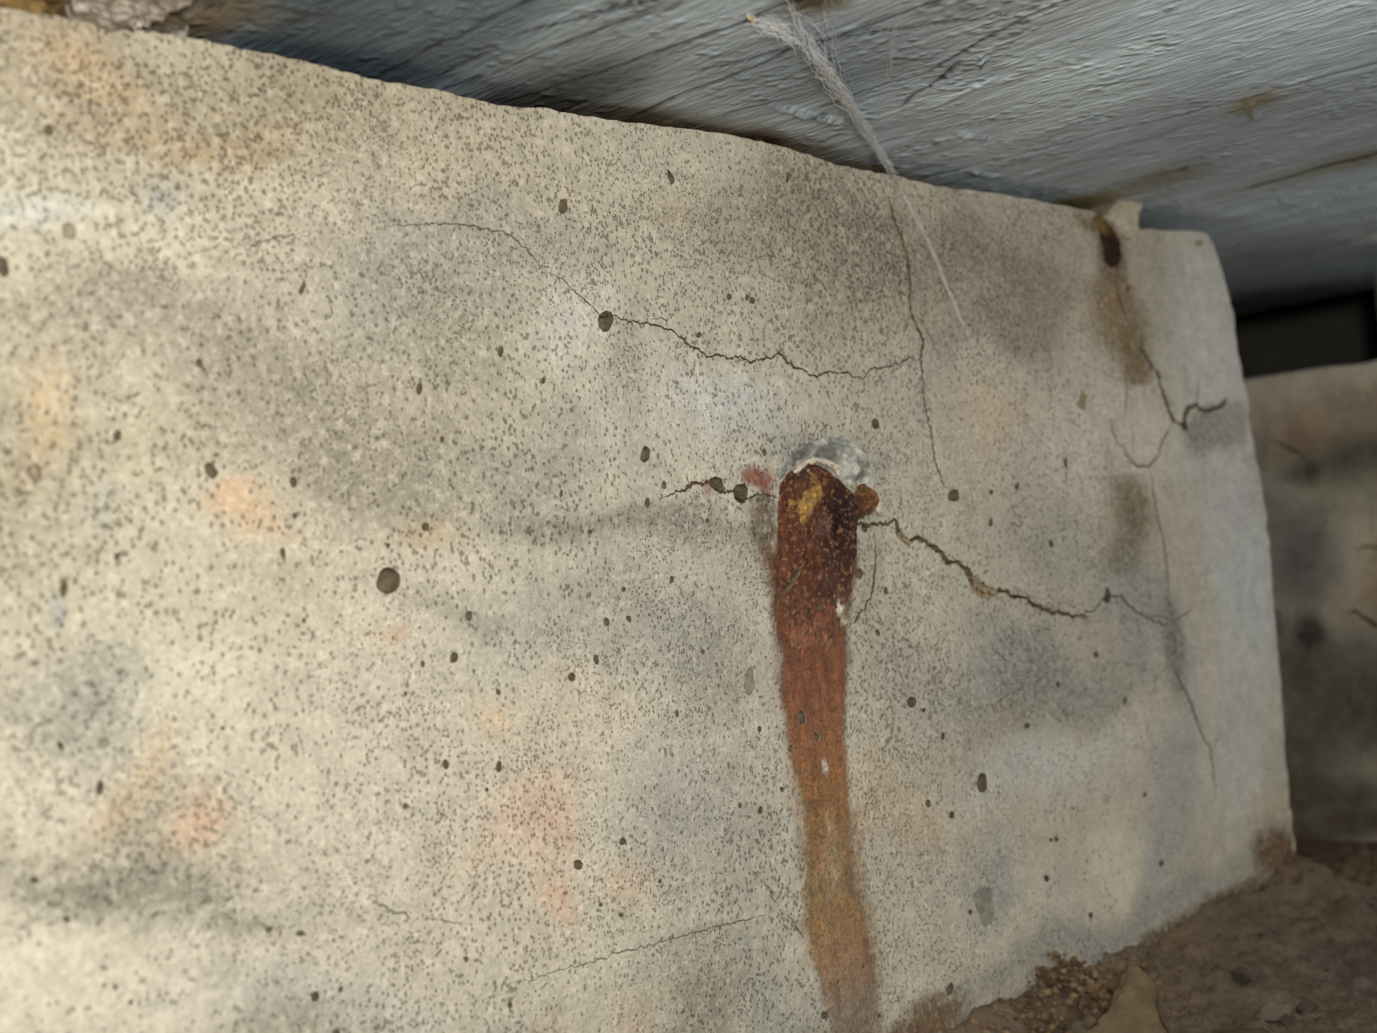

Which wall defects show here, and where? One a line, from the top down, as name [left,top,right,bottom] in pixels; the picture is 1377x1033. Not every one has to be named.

crack [393,192,949,489]
crack [660,473,778,501]
rust [744,463,880,1033]
crack [848,264,1227,798]
crack [1342,609,1377,628]